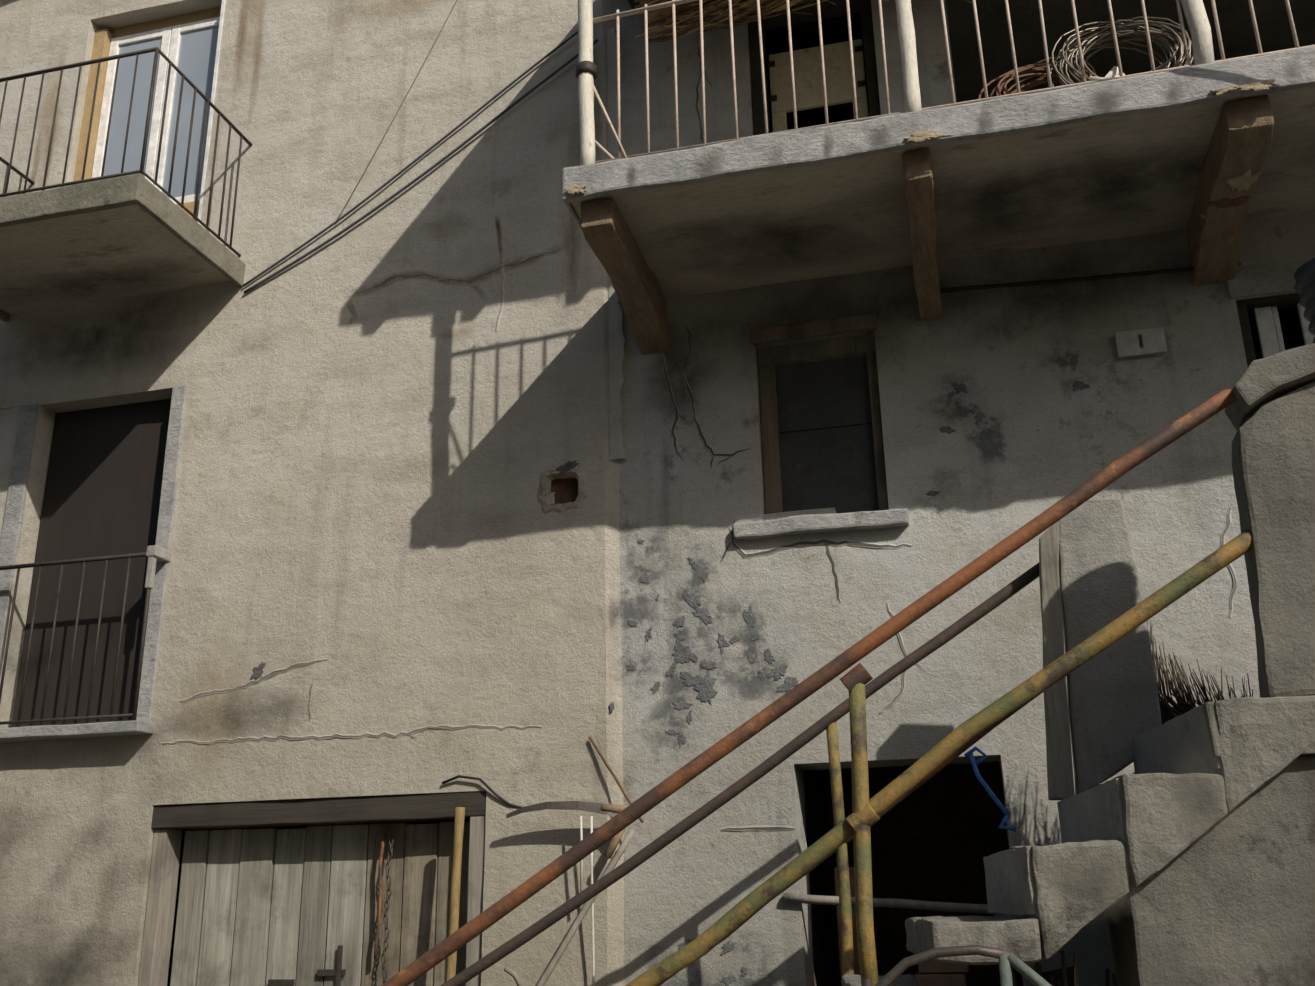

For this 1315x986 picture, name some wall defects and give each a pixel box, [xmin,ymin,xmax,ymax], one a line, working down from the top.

crack [349,218,569,331]
crack [661,325,751,469]
spalling [537,460,588,514]
crack [721,521,912,602]